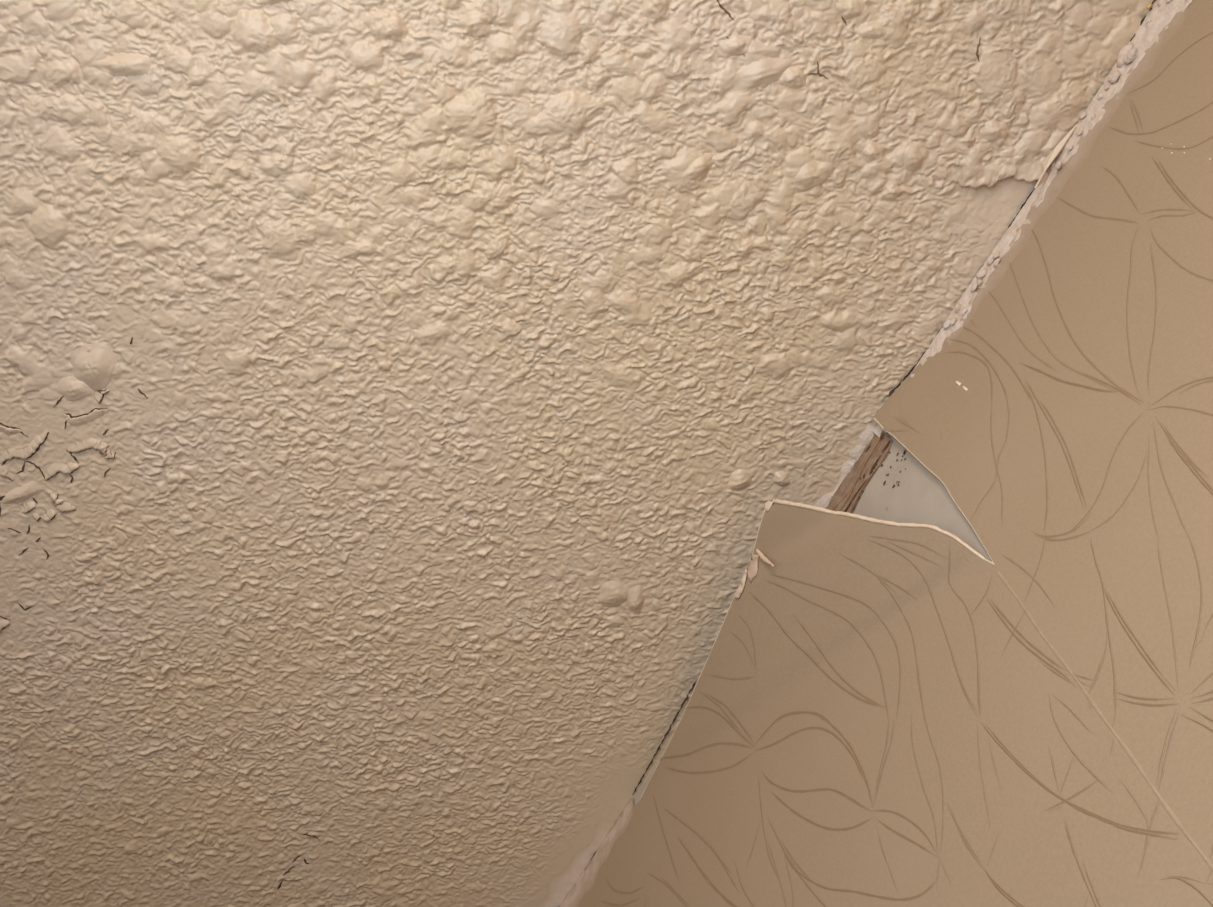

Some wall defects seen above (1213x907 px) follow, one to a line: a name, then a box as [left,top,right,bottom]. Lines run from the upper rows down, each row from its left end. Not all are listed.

flaking render [910,0,1193,378]
crack [0,389,147,558]
spalling [813,423,887,508]
crack [0,602,32,631]